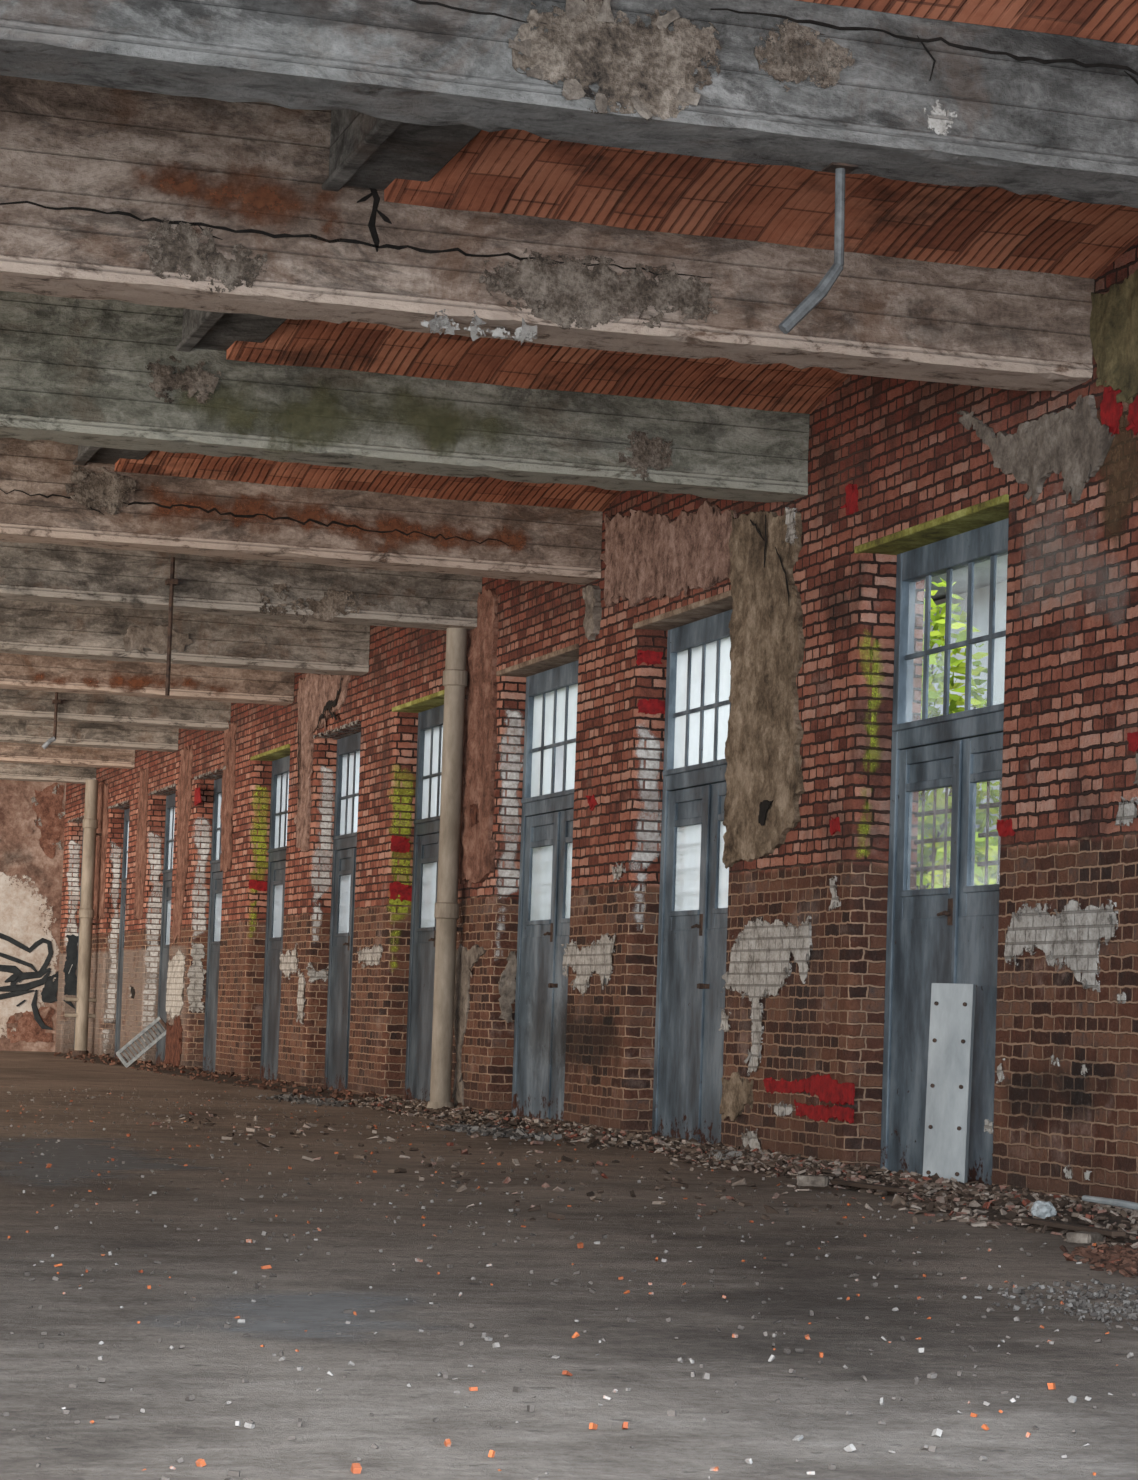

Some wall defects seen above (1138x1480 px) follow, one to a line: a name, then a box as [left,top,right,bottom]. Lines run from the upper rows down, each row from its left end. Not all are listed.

crack [711,8,1138,85]
crack [0,188,712,278]
peeling [784,507,801,546]
spalling [31,782,65,859]
spalling [758,800,774,826]
peeling [829,876,841,911]
peeling [0,872,59,1043]
peeling [1004,899,1118,992]
peeling [719,916,813,1152]